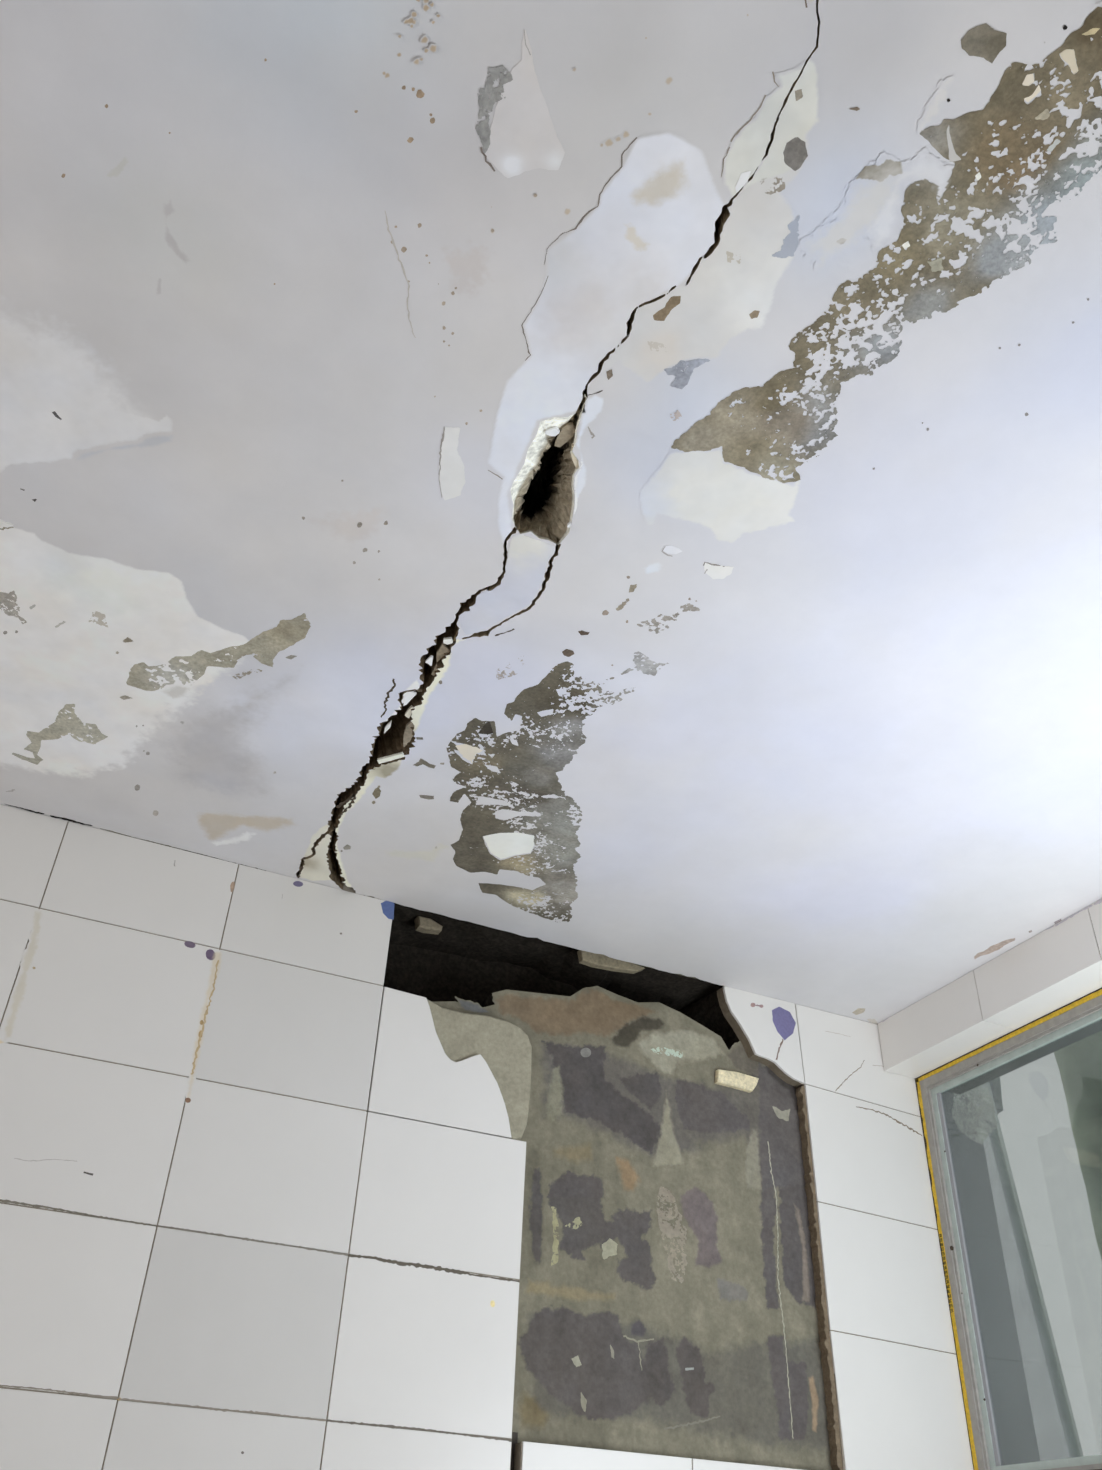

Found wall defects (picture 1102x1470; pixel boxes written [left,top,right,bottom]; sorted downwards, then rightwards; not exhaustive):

crack [577,0,820,411]
peeling [458,7,1102,634]
peeling [0,520,311,792]
crack [100,508,561,892]
peeling [414,630,669,922]
spalling [383,903,740,1049]